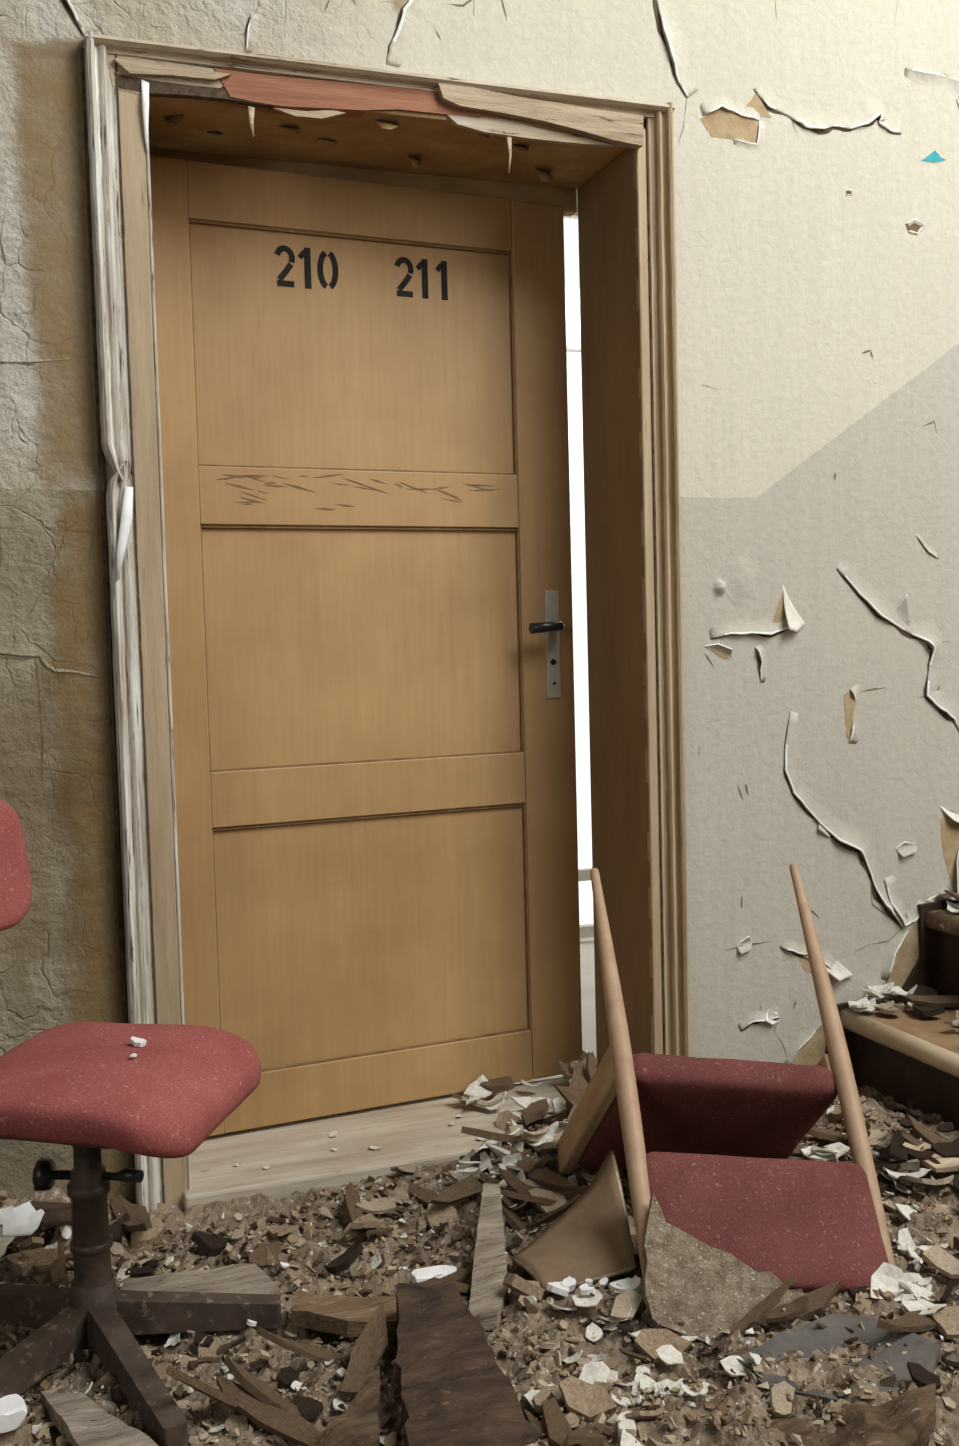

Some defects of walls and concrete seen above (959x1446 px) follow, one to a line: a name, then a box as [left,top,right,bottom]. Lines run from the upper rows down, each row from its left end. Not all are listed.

crack [60,0,102,36]
crack [386,0,507,68]
flaking render [904,67,959,107]
flaking render [700,93,771,151]
peeling [703,586,805,683]
crack [837,560,959,731]
crack [783,711,924,952]
flaking render [728,805,959,1012]
flaking render [738,1005,826,1066]